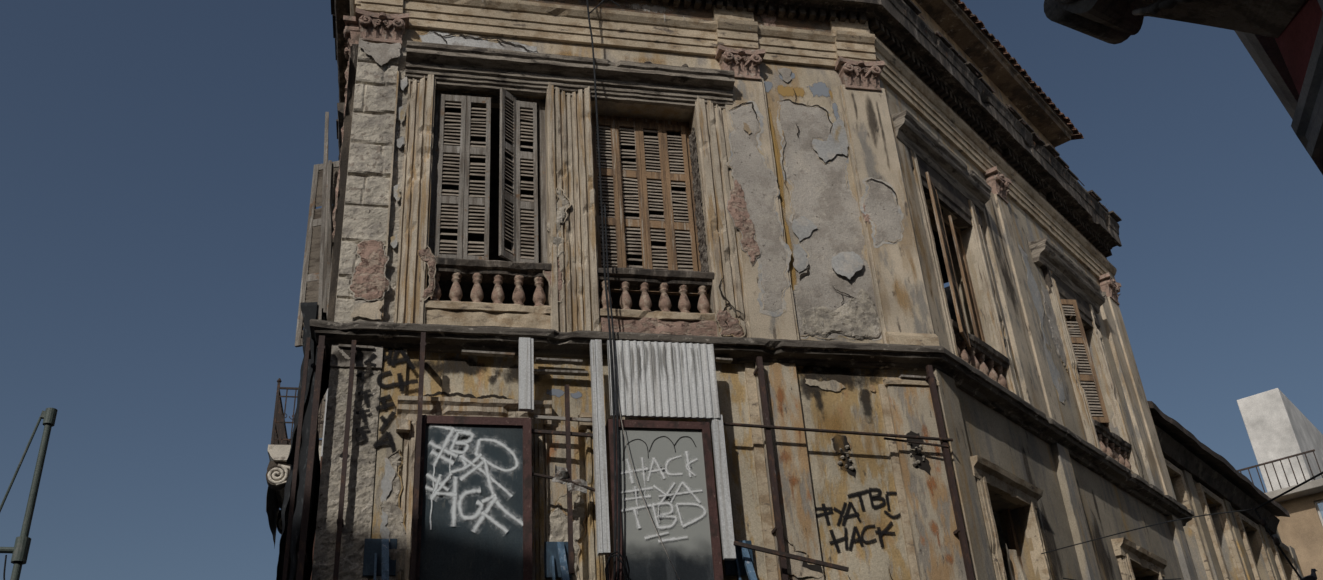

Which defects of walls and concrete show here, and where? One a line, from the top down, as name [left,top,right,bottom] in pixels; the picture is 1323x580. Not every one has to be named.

flaking render [417,30,540,53]
flaking render [332,39,408,323]
flaking render [417,245,436,302]
flaking render [726,68,904,341]